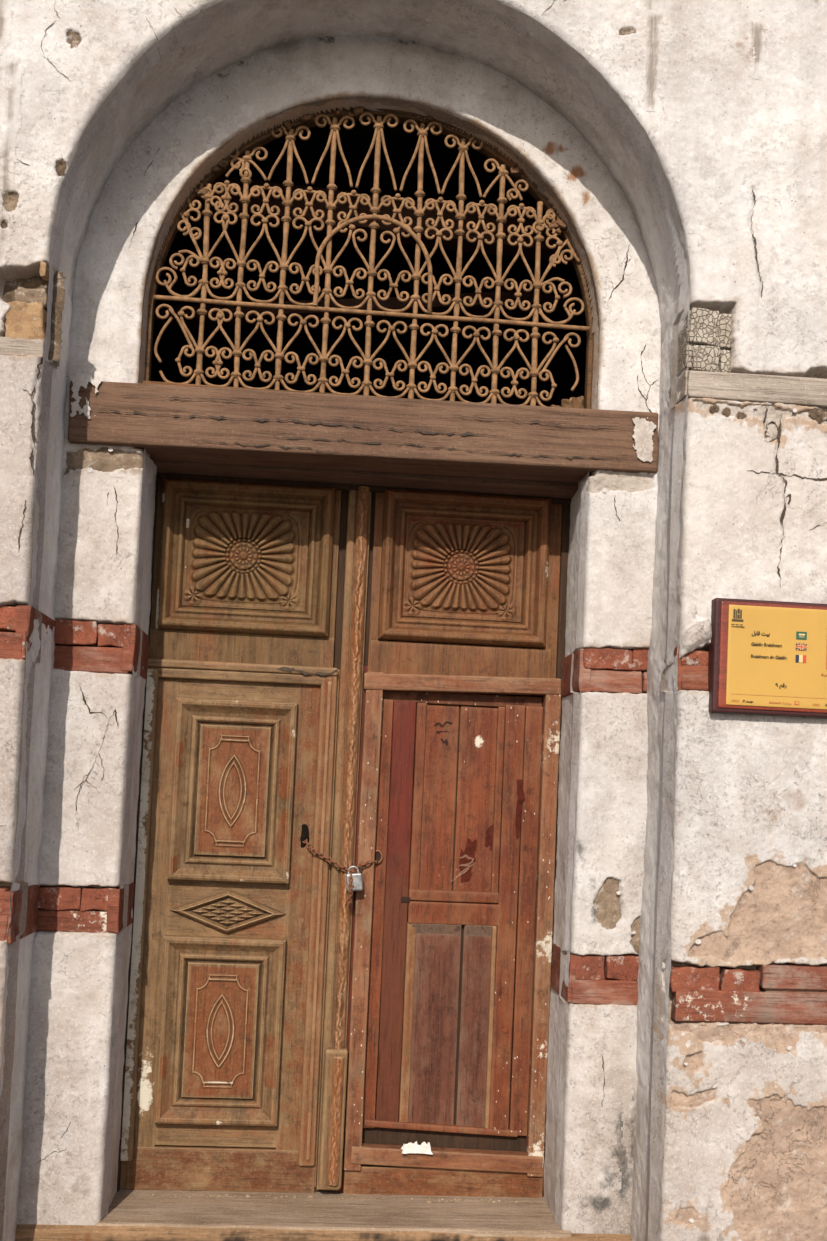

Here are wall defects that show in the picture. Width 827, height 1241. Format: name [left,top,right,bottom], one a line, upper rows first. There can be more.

damp [0,0,24,286]
crack [751,189,763,297]
crack [749,408,827,587]
crack [75,685,118,833]
peeling [593,877,641,953]
peeling [688,861,827,963]
damp [0,943,11,1006]
peeling [670,1083,717,1107]
peeling [668,1018,827,1071]
peeling [675,1207,699,1224]
peeling [722,1094,827,1241]